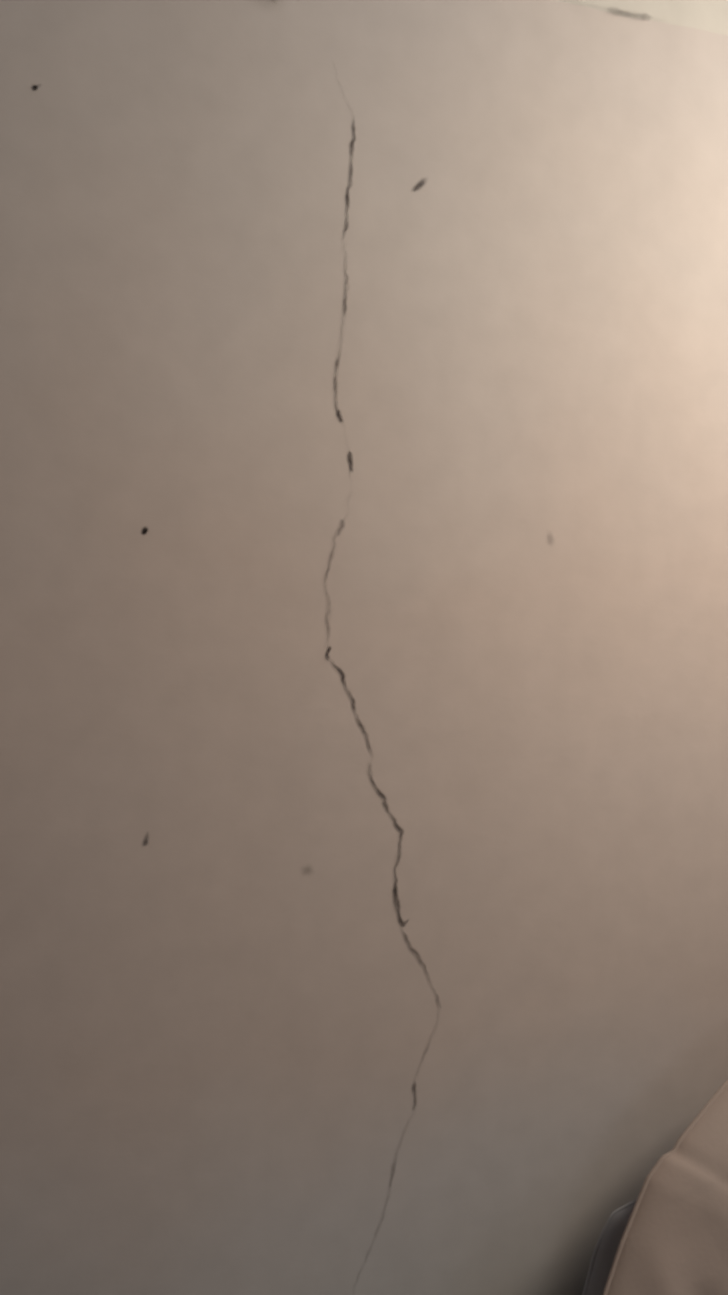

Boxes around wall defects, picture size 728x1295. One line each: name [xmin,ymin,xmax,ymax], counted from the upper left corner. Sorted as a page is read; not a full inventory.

crack [345,125,356,231]
crack [326,647,427,973]